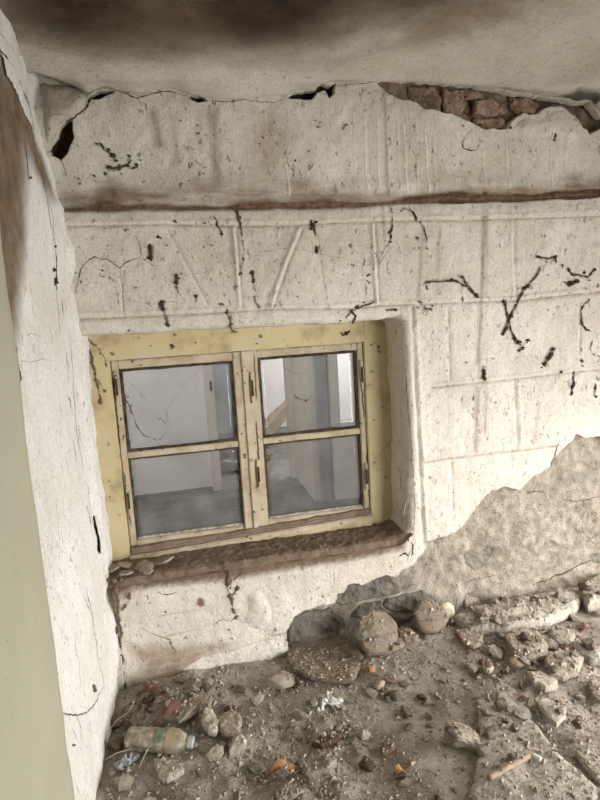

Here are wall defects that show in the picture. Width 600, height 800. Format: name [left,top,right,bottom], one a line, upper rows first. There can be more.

crack [47,82,370,175]
spalling [376,81,600,135]
crack [25,141,57,276]
crack [22,237,210,379]
spalling [286,434,600,647]
crack [63,594,105,740]
crack [145,592,247,647]